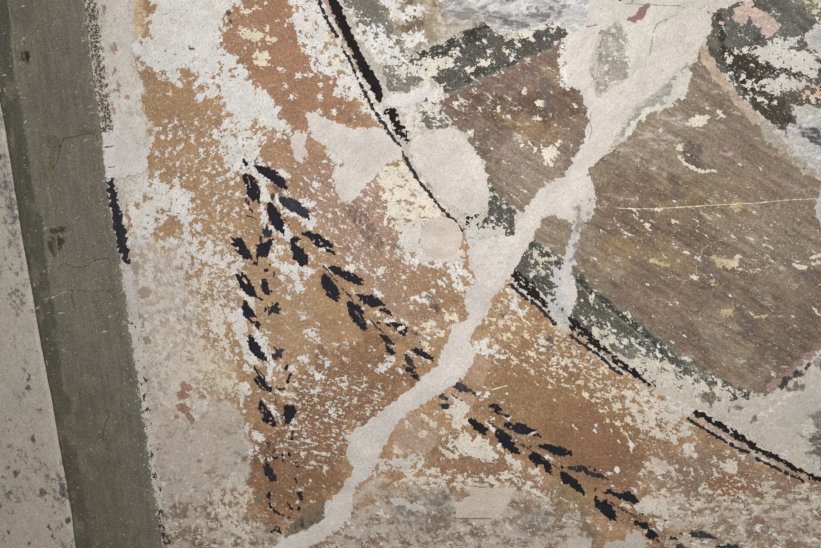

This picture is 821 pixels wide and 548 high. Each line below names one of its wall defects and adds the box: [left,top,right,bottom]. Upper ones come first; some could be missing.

peeling [595,22,633,94]
peeling [615,62,694,138]
peeling [686,108,726,127]
peeling [724,35,821,111]
peeling [674,143,717,173]
peeling [98,0,592,548]
crack [272,0,713,548]
peeling [710,255,739,270]
peeling [471,283,821,536]